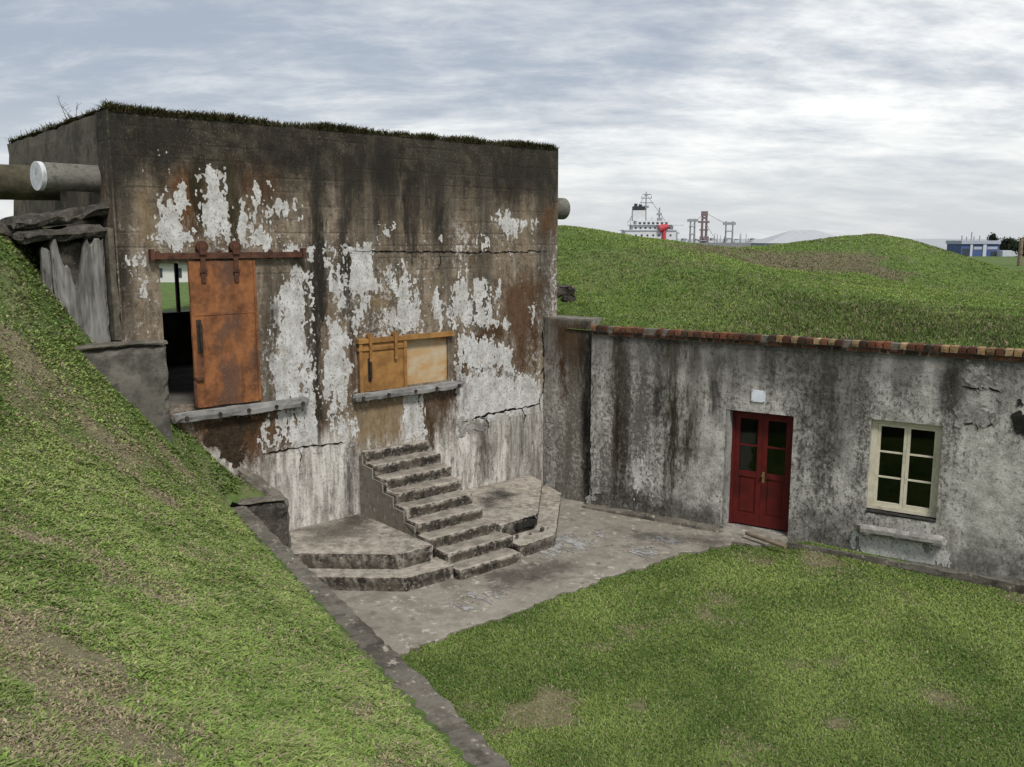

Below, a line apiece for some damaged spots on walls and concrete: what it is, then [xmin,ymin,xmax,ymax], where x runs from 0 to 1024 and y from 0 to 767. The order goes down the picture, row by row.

crack [263,441,346,465]
peeling [147,163,559,490]
crack [464,317,545,428]
leakage [667,340,680,465]
spalling [963,359,1000,401]
spalling [1010,399,1024,436]